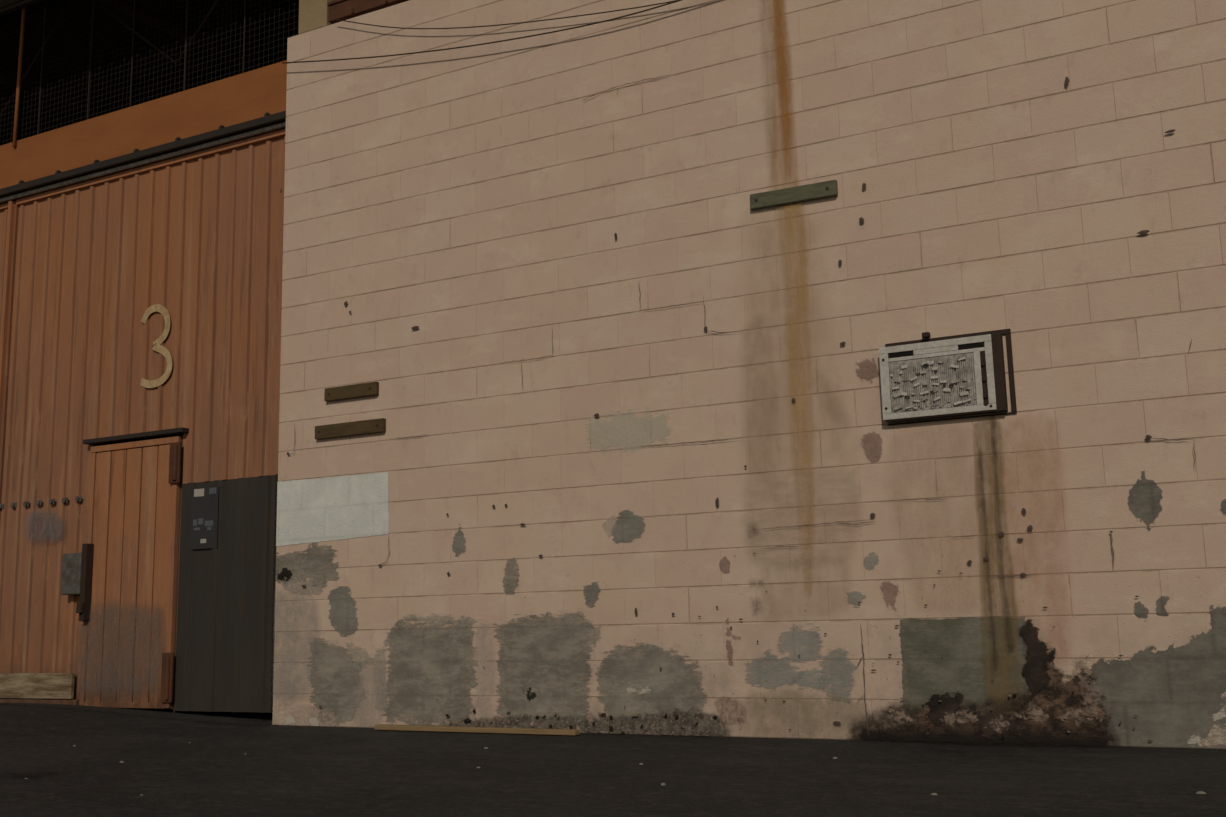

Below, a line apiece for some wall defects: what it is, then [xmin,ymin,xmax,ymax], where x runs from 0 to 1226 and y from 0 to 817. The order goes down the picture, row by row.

spalling [859,619,1138,746]
peeling [1186,691,1226,748]